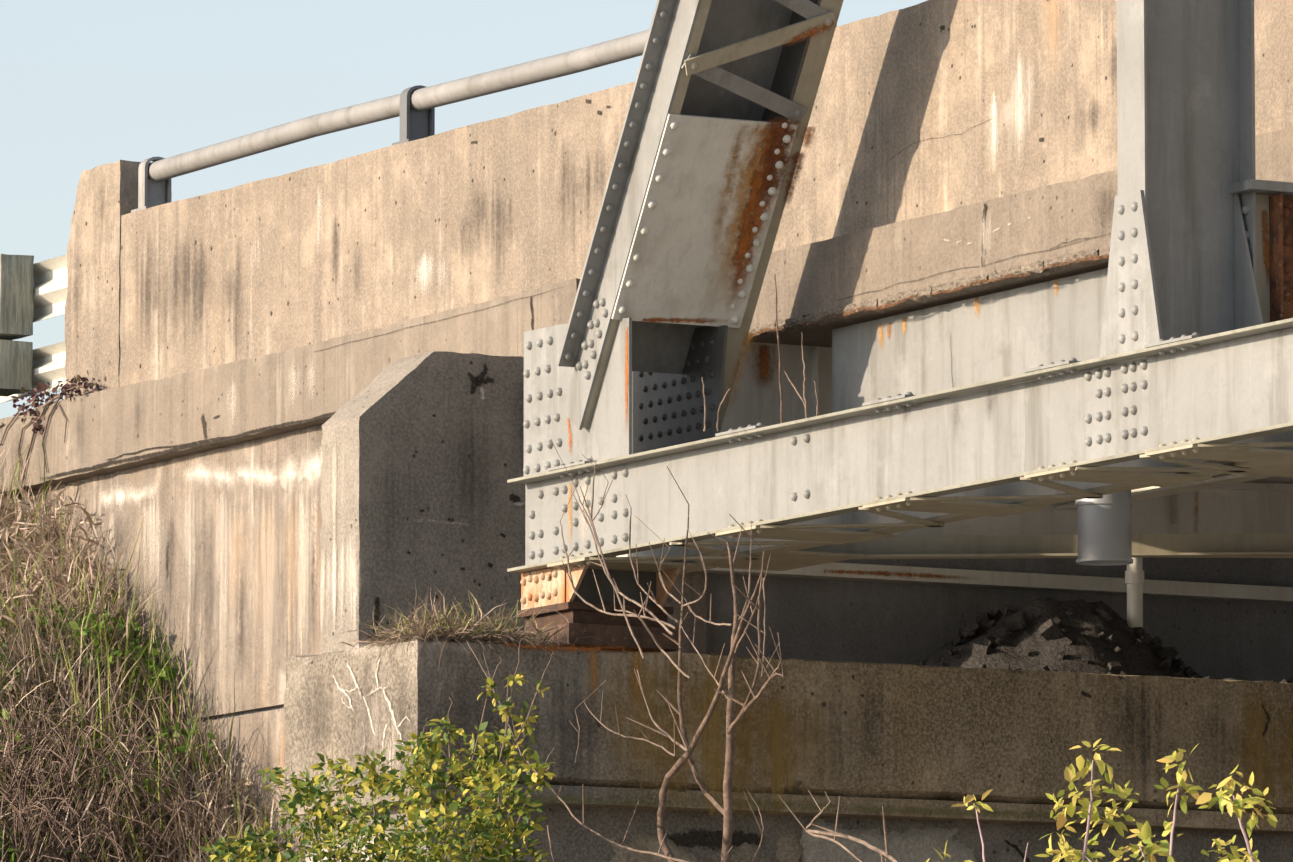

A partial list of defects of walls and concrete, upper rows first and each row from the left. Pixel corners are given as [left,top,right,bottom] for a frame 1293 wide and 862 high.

corrosion [720,118,815,277]
leakage [187,458,336,507]
leakage [103,491,172,570]
leakage [289,495,356,631]
leakage [615,658,806,809]
flaking render [608,816,977,862]
crack [1005,840,1093,862]